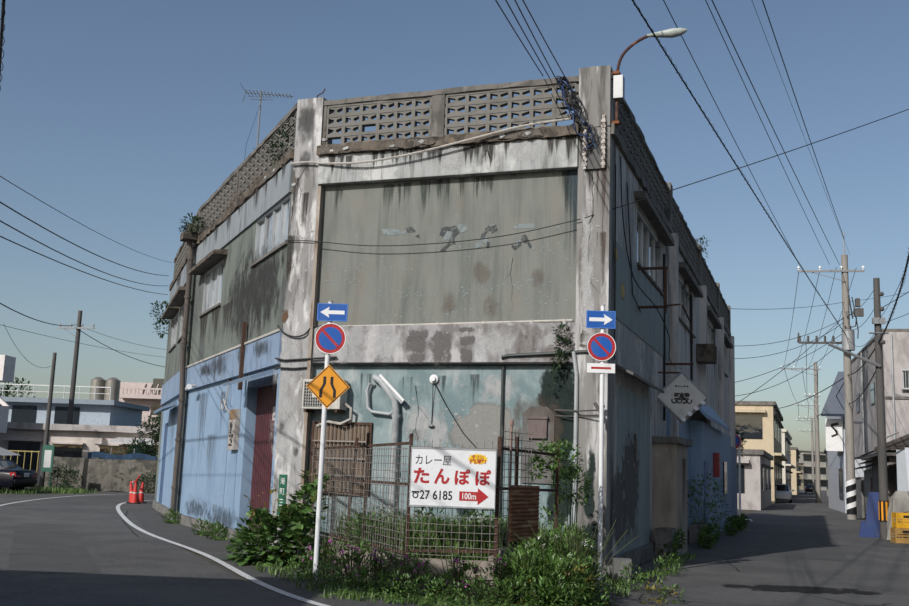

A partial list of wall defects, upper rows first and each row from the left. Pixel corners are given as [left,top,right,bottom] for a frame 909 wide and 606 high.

damp [329,155,352,171]
damp [373,147,442,165]
damp [463,141,509,162]
damp [293,178,309,216]
peeling [437,224,494,257]
damp [200,236,294,337]
damp [406,327,475,363]
damp [201,356,222,374]